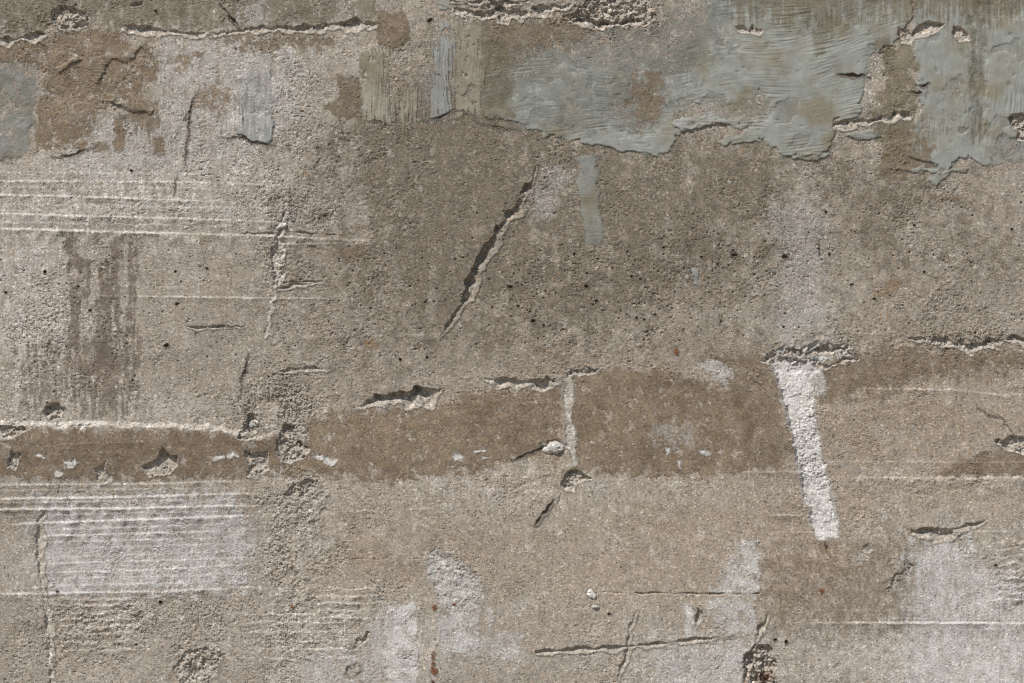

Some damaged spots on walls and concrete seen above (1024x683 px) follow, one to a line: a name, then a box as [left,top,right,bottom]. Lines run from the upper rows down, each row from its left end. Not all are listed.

crack [119,3,378,40]
peeling [355,0,1024,186]
crack [173,81,200,196]
crack [907,333,1024,357]
spalling [353,385,443,411]
spalling [141,447,179,478]
spalling [483,365,602,493]
spalling [760,339,860,541]
spalling [994,435,1024,456]
crack [533,498,555,527]
crack [617,609,639,681]